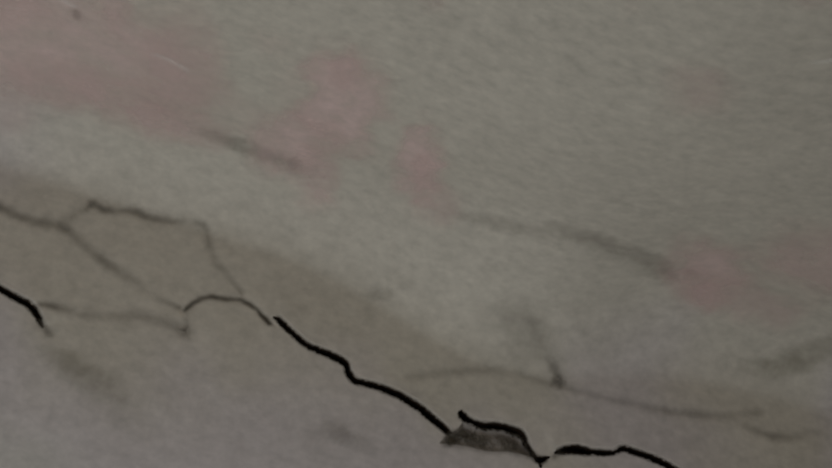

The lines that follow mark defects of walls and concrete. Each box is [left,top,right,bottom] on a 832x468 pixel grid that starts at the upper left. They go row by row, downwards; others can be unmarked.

crack [0,286,44,328]
crack [185,295,452,435]
crack [554,444,678,468]